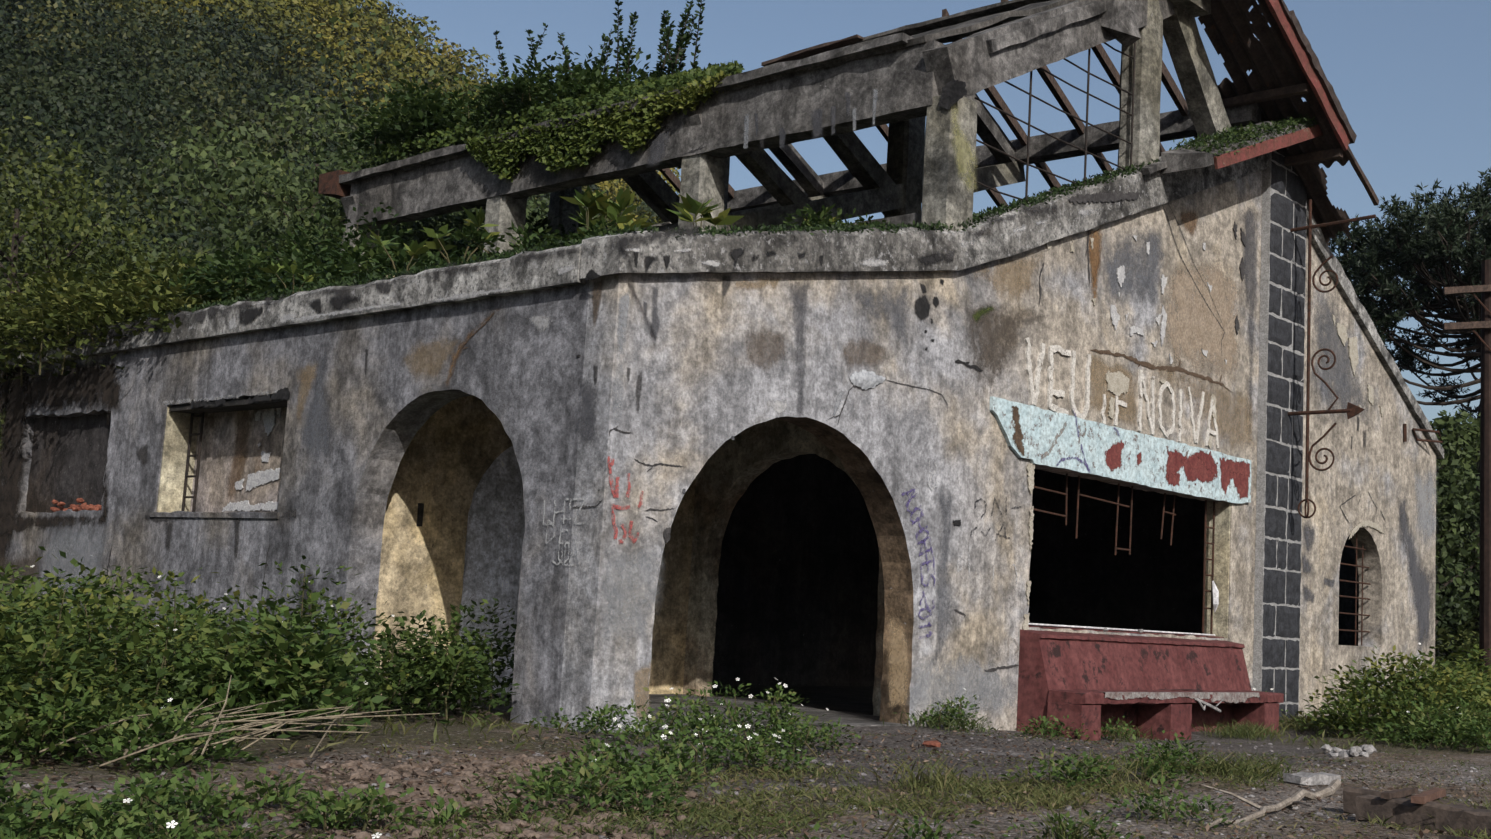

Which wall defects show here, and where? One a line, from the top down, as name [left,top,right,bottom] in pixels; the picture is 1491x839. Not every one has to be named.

damp [1105,233,1163,300]
peeling [1105,370,1130,419]
damp [1399,474,1435,646]